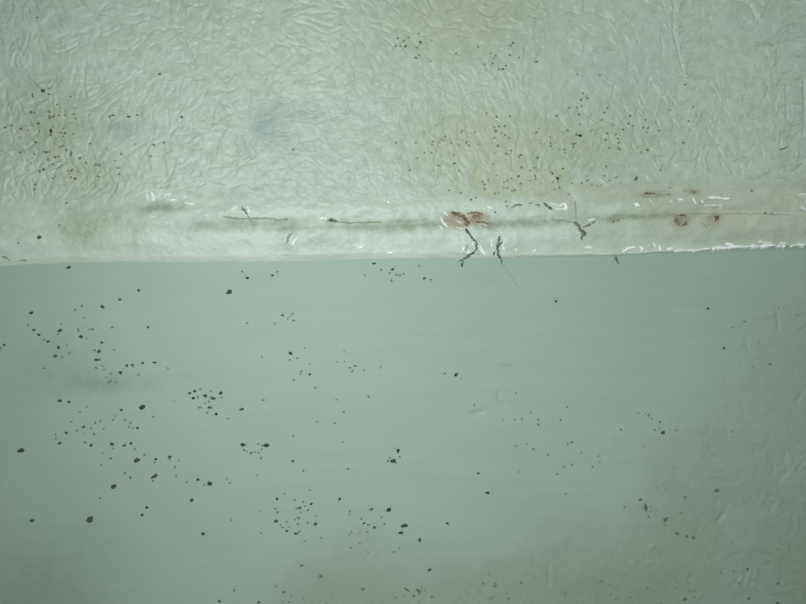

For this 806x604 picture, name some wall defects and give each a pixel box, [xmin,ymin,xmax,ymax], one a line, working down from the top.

water stain [30,104,101,180]
water stain [470,112,806,240]
rust [450,211,489,233]
crack [487,201,596,253]
crack [459,230,521,289]
water stain [93,341,157,383]
mould [274,493,317,542]